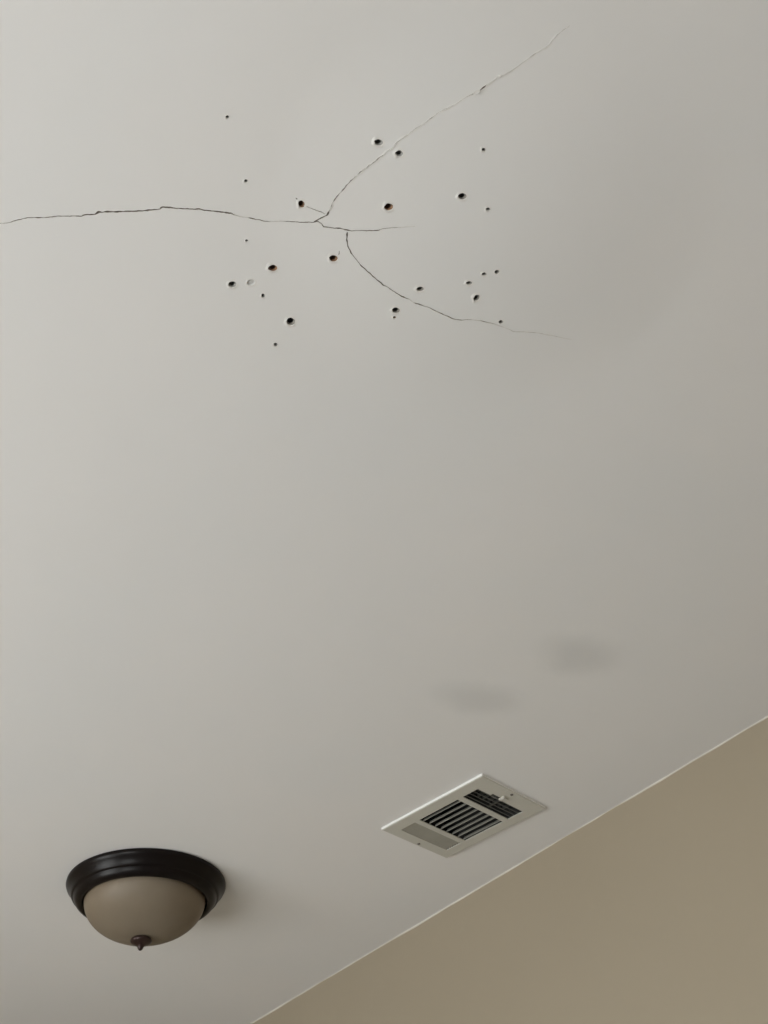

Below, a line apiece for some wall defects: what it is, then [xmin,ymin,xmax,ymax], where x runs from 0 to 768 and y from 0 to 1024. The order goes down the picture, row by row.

crack [0,25,572,340]